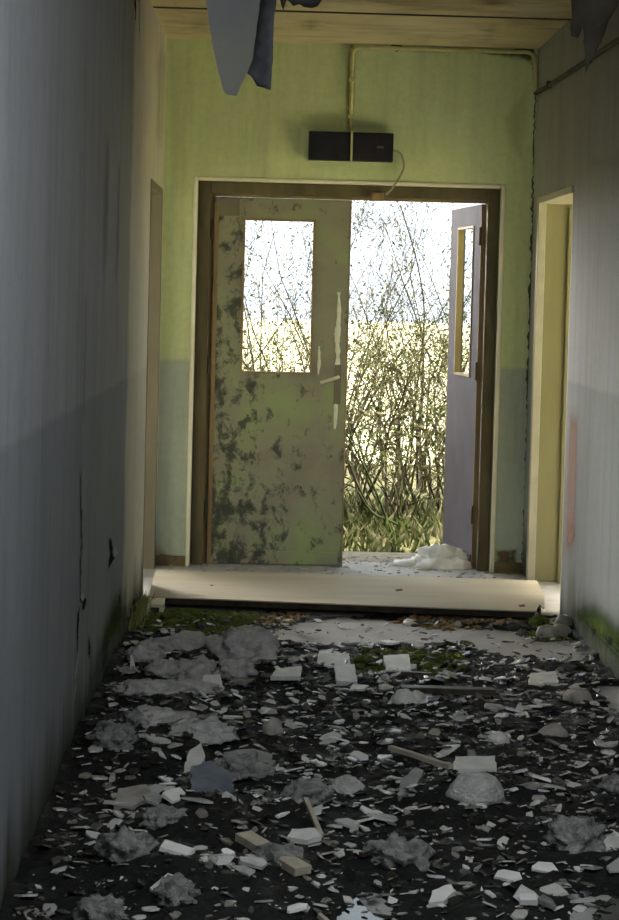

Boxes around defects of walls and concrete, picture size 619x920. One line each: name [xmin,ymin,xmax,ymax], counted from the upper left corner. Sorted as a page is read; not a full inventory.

crack [73,472,83,703]